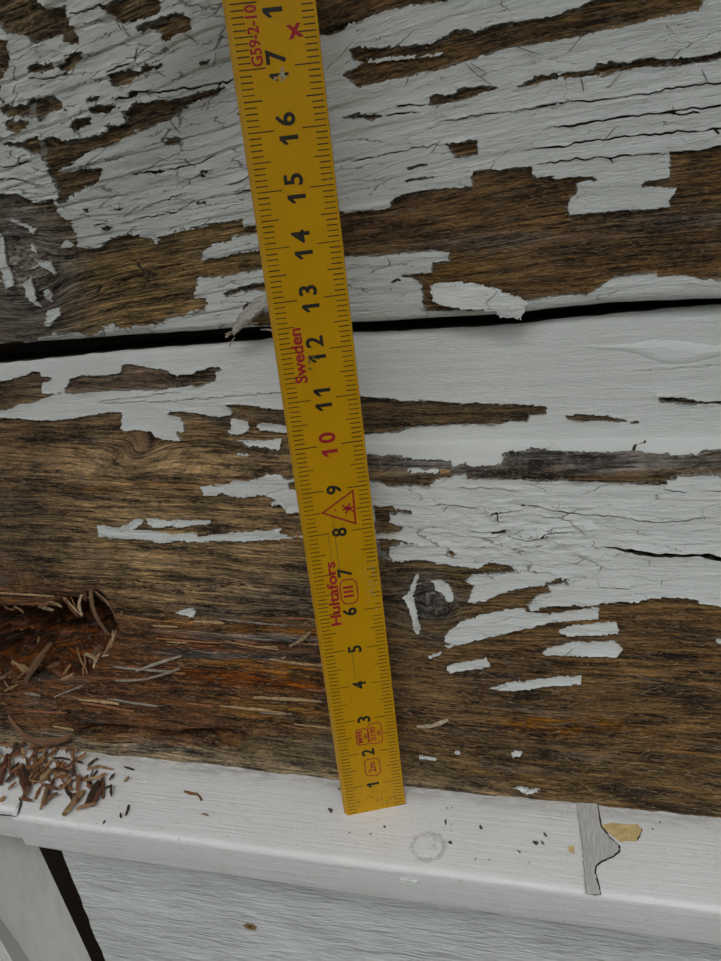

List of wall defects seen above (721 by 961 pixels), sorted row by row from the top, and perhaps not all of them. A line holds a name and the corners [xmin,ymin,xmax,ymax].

crack [108,54,234,100]
crack [387,104,423,116]
peeling [343,0,721,88]
crack [523,82,721,164]
peeling [0,0,266,344]
crack [95,155,216,230]
peeling [339,145,721,320]
peeling [366,440,721,487]
crack [435,487,611,541]
peeling [0,364,339,780]
crack [599,547,721,571]
peeling [373,505,721,896]